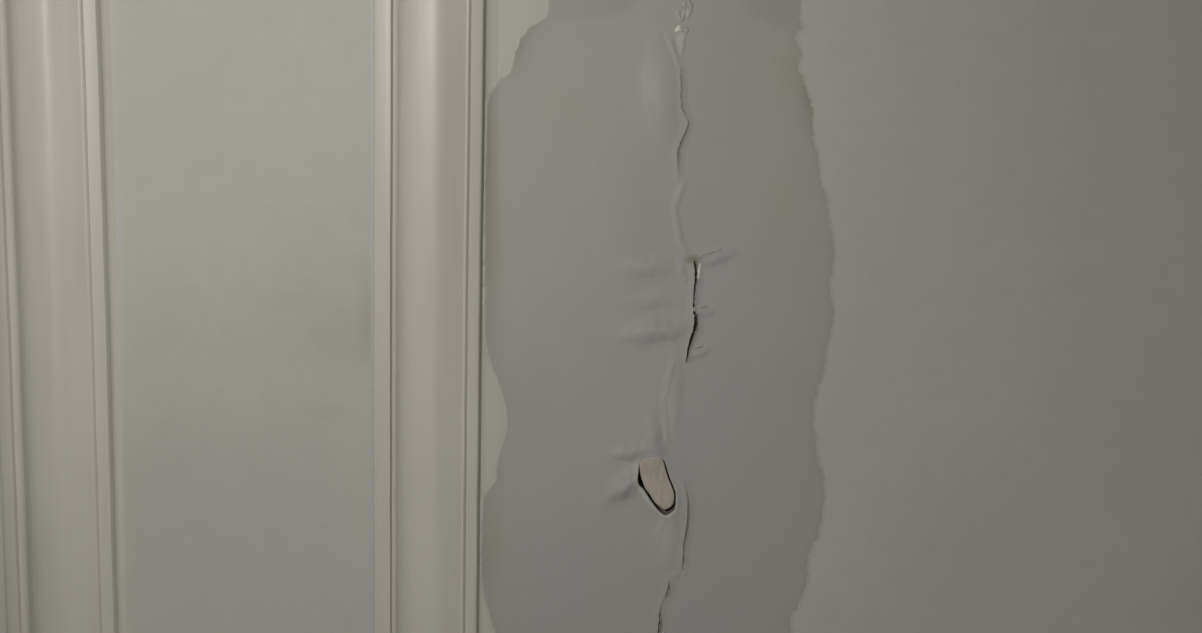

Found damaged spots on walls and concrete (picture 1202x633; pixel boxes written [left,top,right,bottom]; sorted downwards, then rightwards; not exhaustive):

crack [658,30,722,452]
flaking render [638,457,676,515]
crack [651,475,696,633]